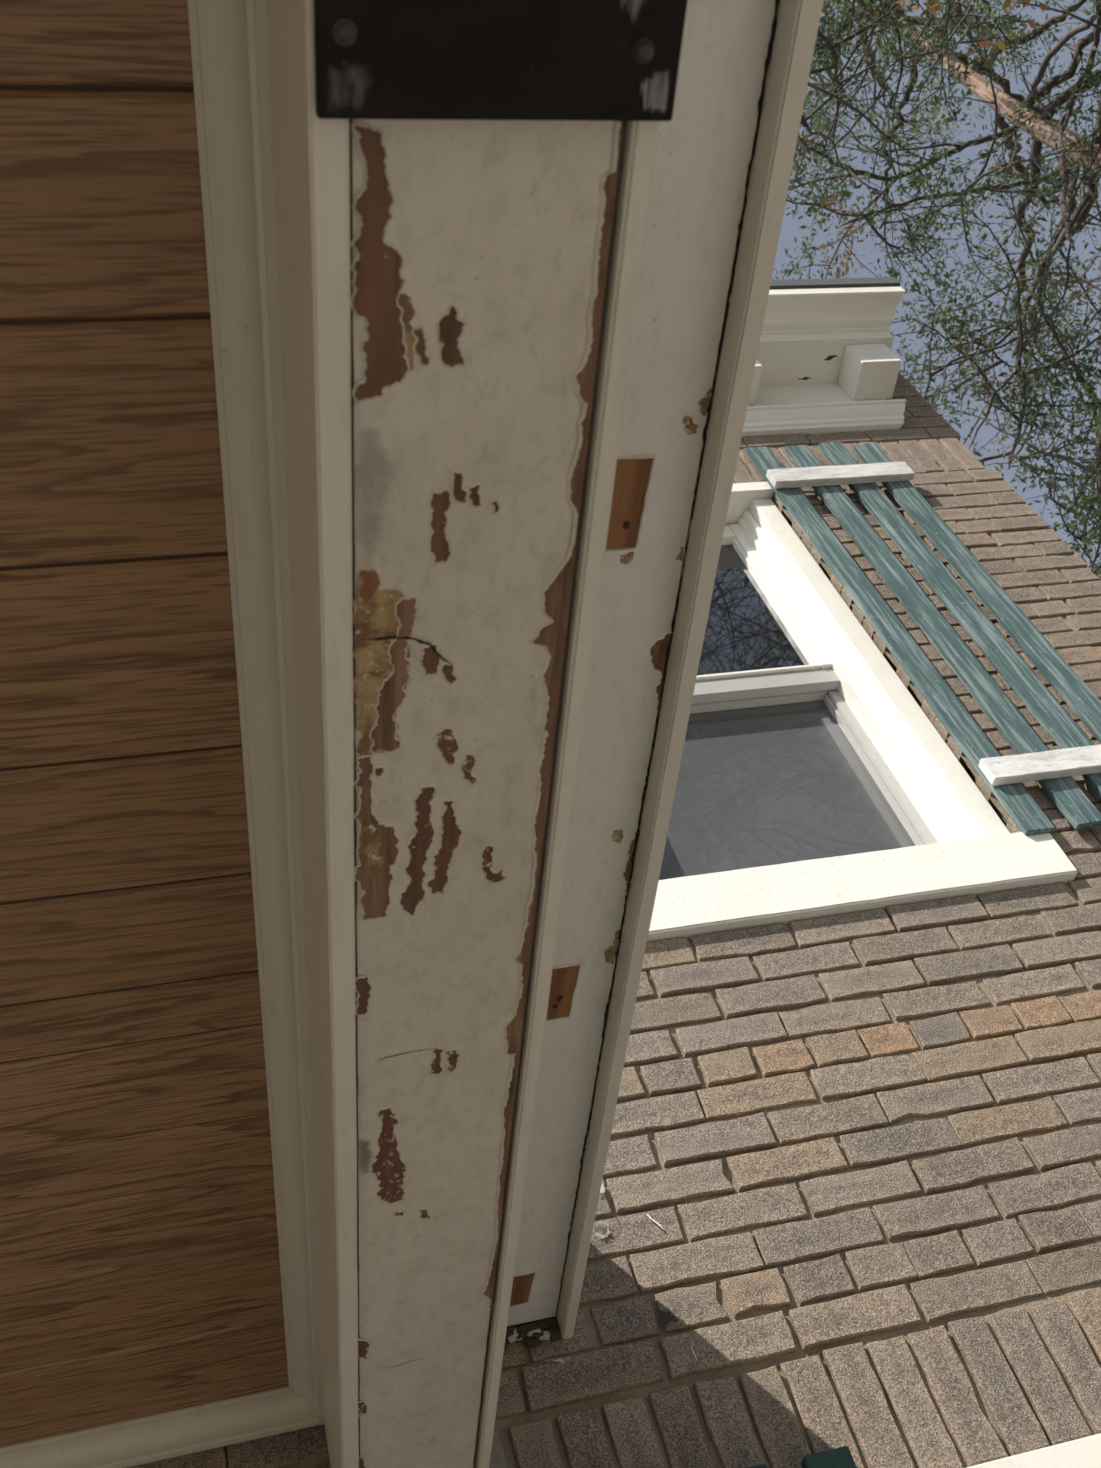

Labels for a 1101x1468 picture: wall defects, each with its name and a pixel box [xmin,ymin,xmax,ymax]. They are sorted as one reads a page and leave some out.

peeling [350,122,467,405]
peeling [427,470,501,564]
peeling [606,454,656,564]
peeling [352,570,464,921]
peeling [434,726,480,787]
peeling [479,121,624,1308]
peeling [649,631,673,711]
peeling [612,829,638,892]
peeling [369,1106,432,1219]
flaking render [504,1318,562,1348]